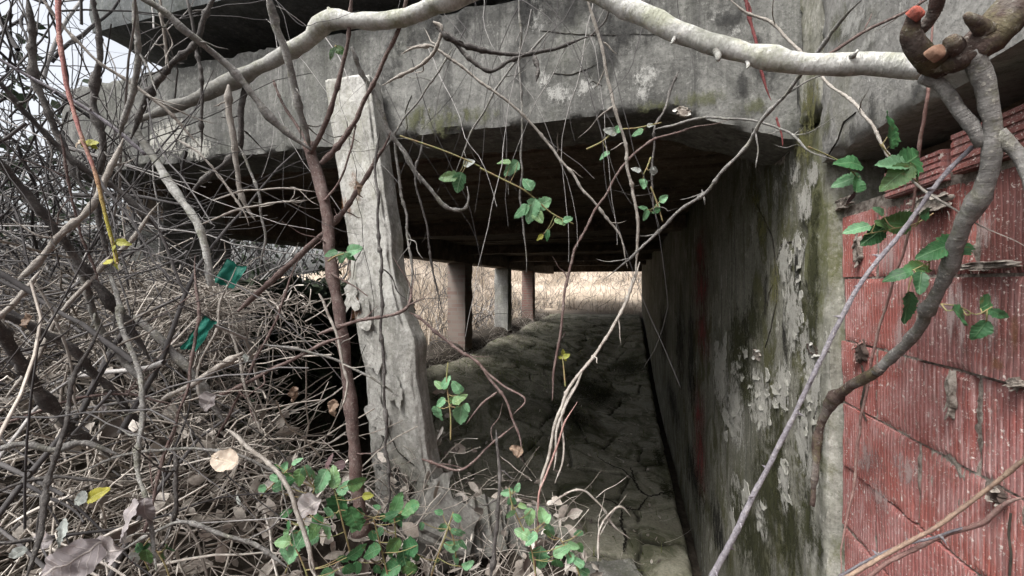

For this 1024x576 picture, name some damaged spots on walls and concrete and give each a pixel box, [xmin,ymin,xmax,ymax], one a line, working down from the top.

damp [512,0,647,102]
damp [634,67,657,99]
flaking render [344,278,403,437]
flaking render [712,332,817,450]
damp [762,158,822,495]
flaking render [788,238,820,381]
crack [859,365,867,421]
crack [595,456,674,552]